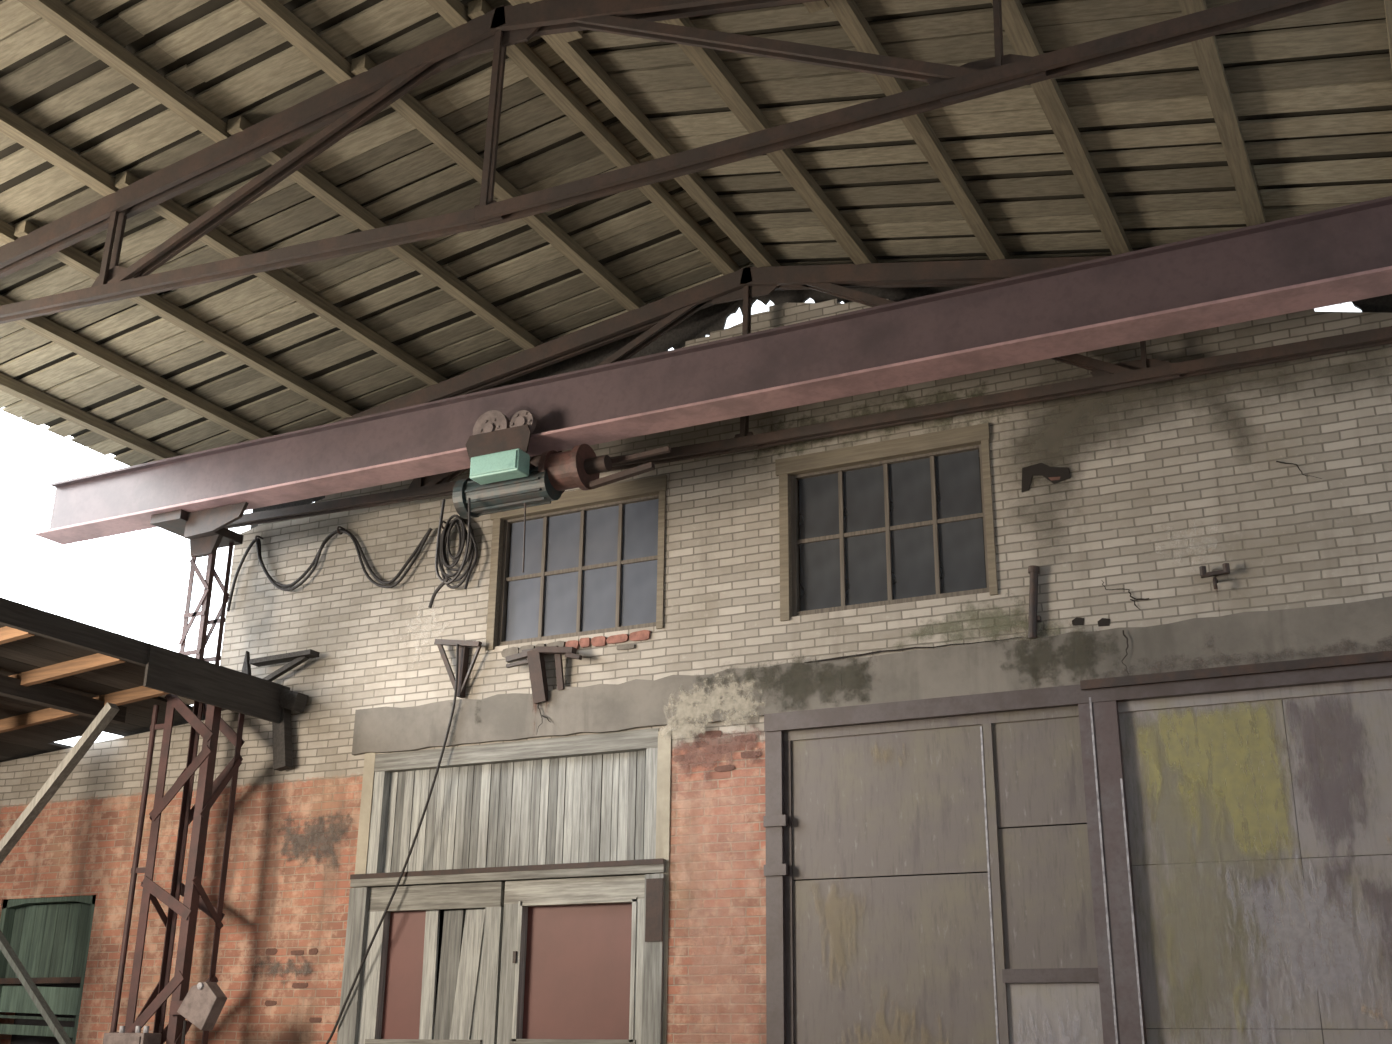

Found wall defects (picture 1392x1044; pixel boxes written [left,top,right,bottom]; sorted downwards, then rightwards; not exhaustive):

water stain [1017,354,1380,480]
spalling [501,630,651,663]
water stain [914,611,1112,686]
water stain [700,657,869,709]
water stain [281,814,351,866]
water stain [254,956,312,975]